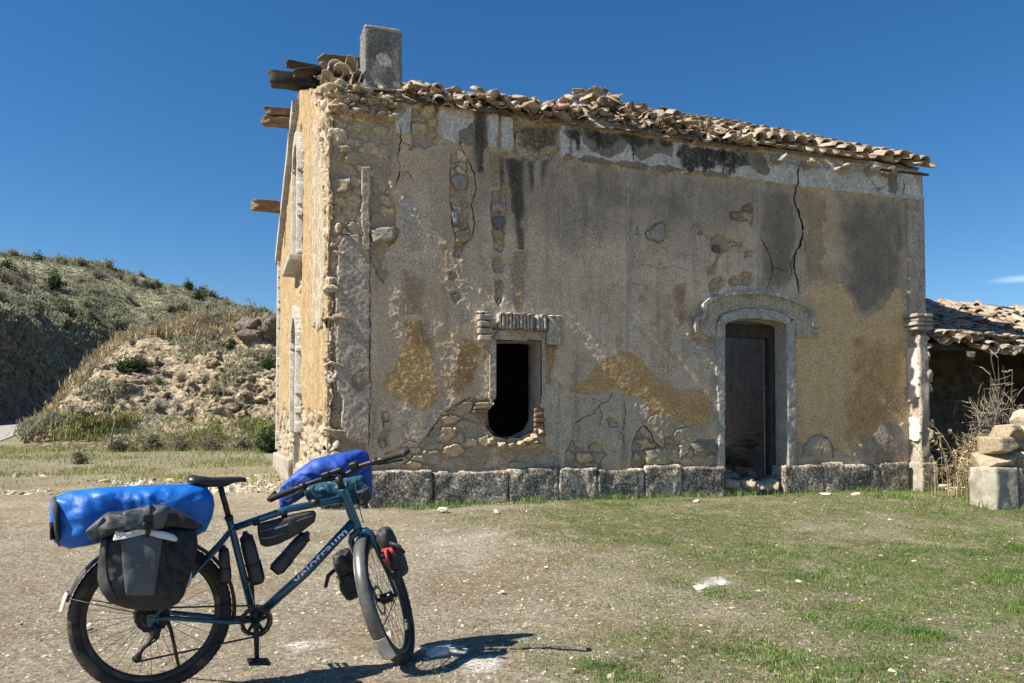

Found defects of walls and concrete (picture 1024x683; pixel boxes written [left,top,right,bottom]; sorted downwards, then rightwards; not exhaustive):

flaking render [278,53,399,464]
crack [396,125,414,184]
crack [453,136,477,235]
damp [474,112,546,311]
damp [522,128,749,270]
crack [761,166,806,291]
flaking render [371,321,606,472]
crack [572,391,685,446]
peeling [570,351,717,427]
peeling [795,281,922,456]